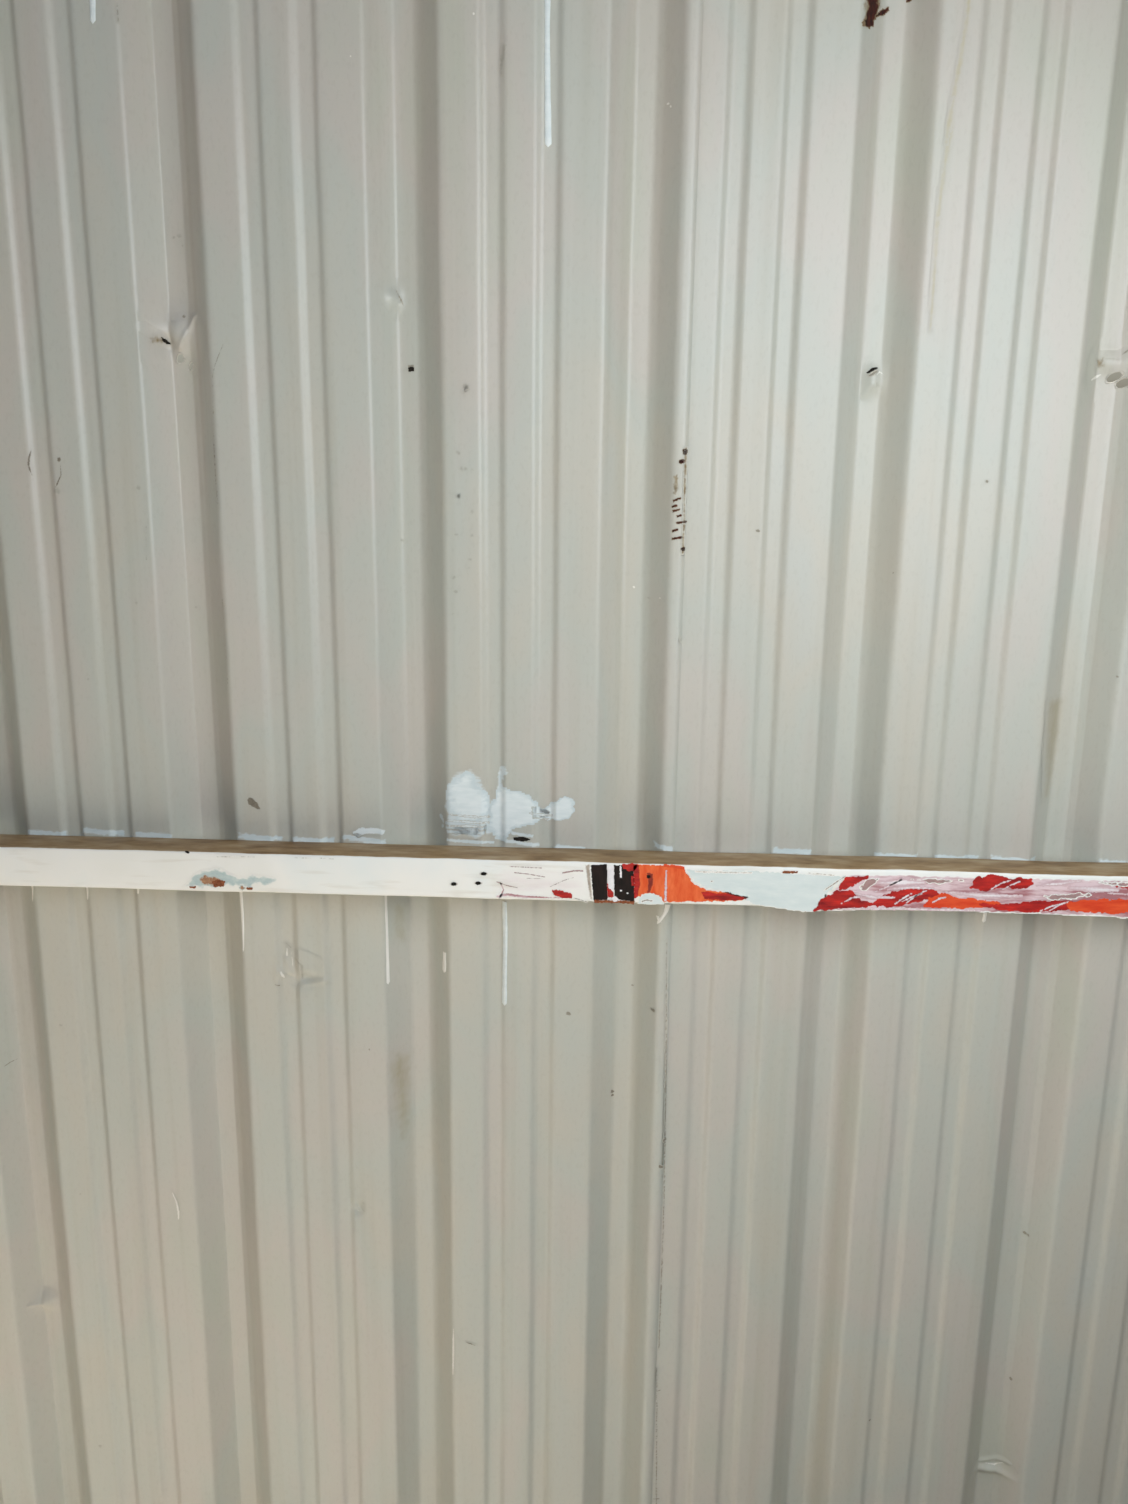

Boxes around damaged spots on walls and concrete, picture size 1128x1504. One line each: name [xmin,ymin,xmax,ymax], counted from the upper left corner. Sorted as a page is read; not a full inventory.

corrosion [859,0,889,29]
corrosion [671,446,688,555]